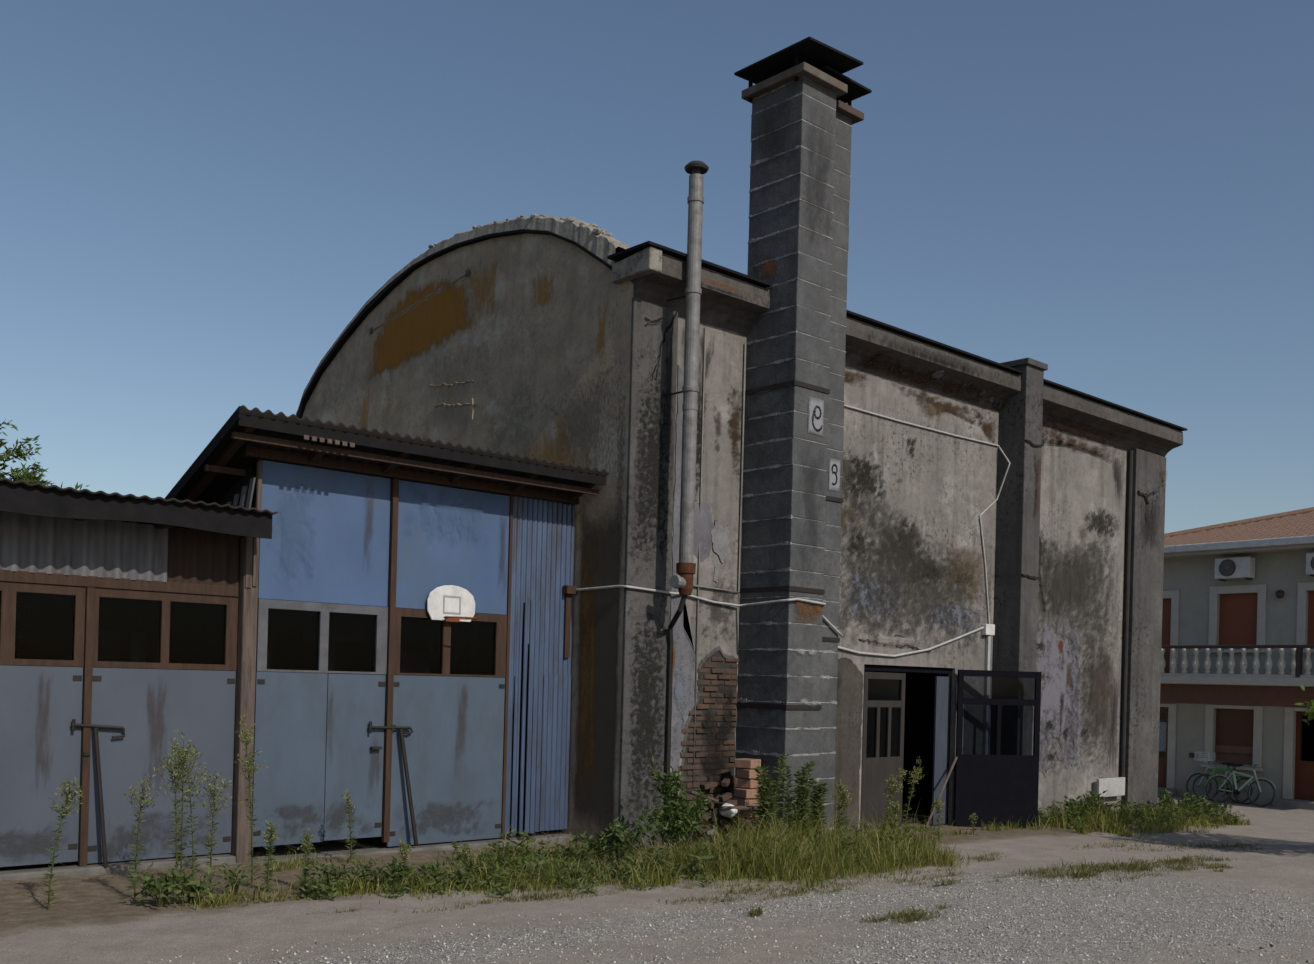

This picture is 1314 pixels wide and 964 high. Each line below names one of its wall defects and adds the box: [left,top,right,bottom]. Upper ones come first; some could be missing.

leakage [551,338,673,826]
spalling [670,365,738,828]
leakage [695,337,742,496]
leakage [705,591,736,631]
leakage [839,451,984,635]
leakage [1037,509,1119,769]